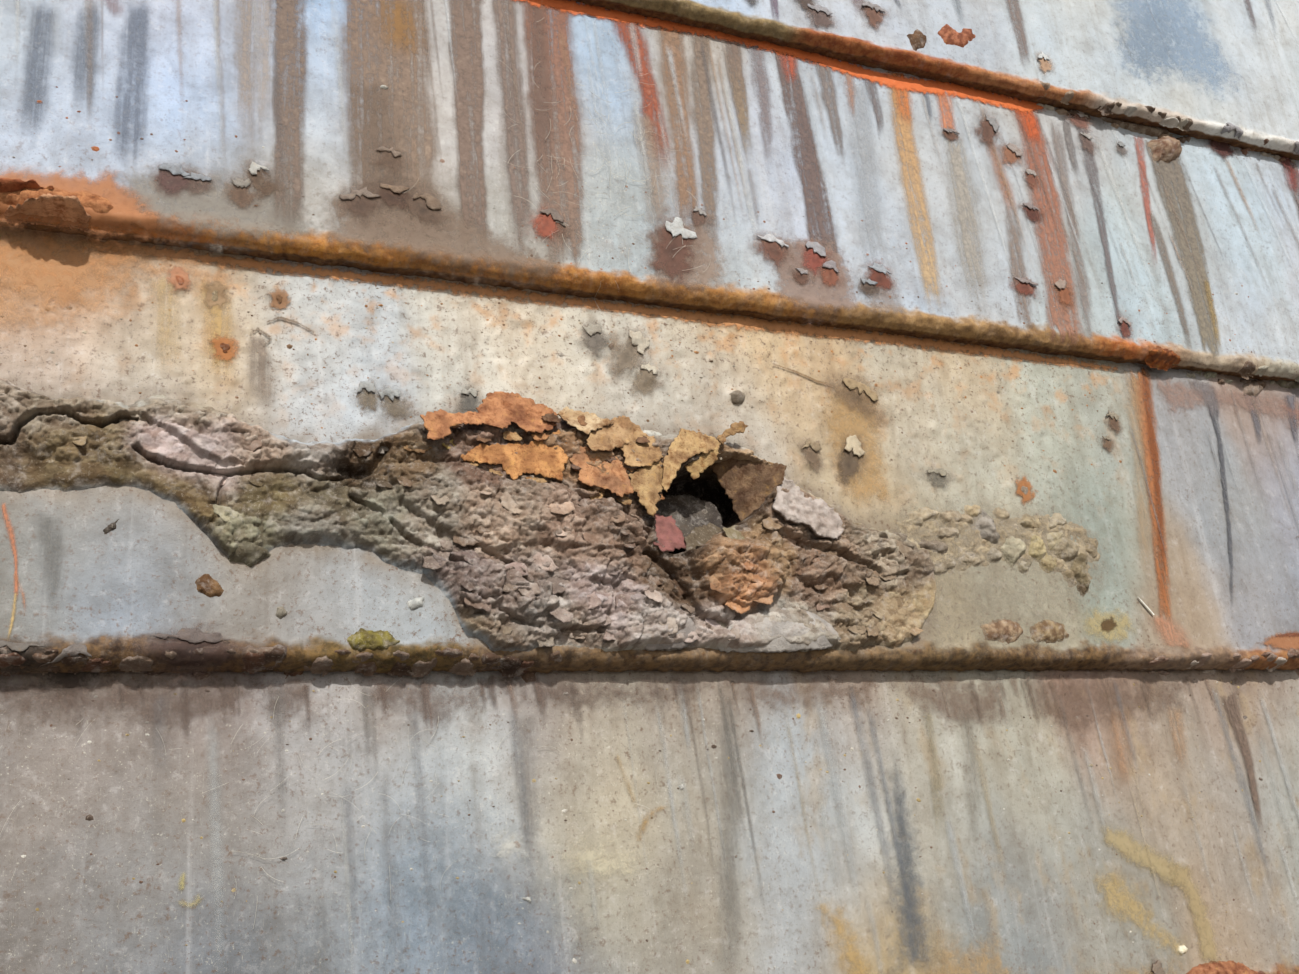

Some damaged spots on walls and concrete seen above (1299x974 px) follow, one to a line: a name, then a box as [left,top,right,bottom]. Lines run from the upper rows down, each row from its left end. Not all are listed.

water stain [24,9,53,121]
water stain [75,1,148,149]
rust [0,0,1219,396]
peeling [654,206,710,282]
peeling [757,234,839,286]
peeling [860,263,891,294]
rust [1240,139,1299,208]
rust [1186,361,1278,389]
spalling [0,378,937,653]
rust [1030,368,1187,725]
peeling [145,628,242,674]
rust [1186,632,1299,817]